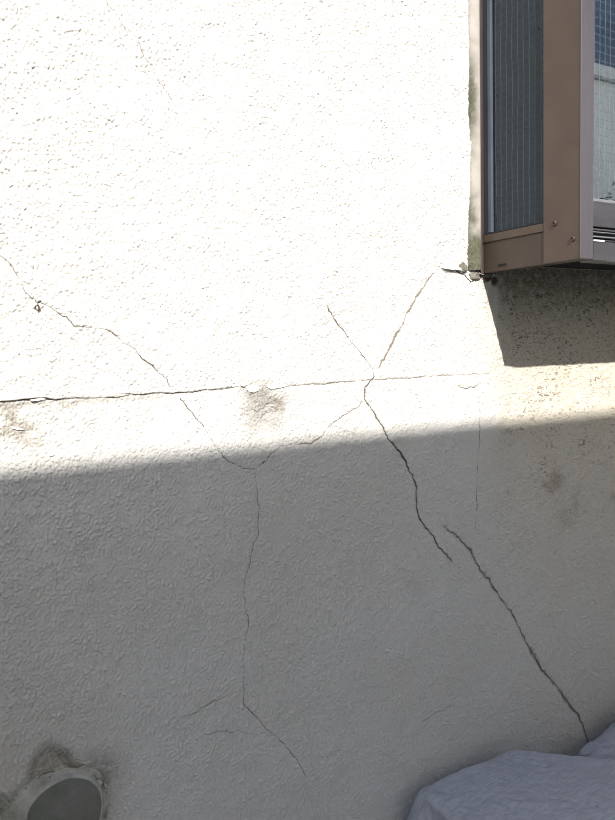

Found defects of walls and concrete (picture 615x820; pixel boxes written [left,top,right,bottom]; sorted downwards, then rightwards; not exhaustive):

crack [1,256,117,336]
crack [0,269,588,743]